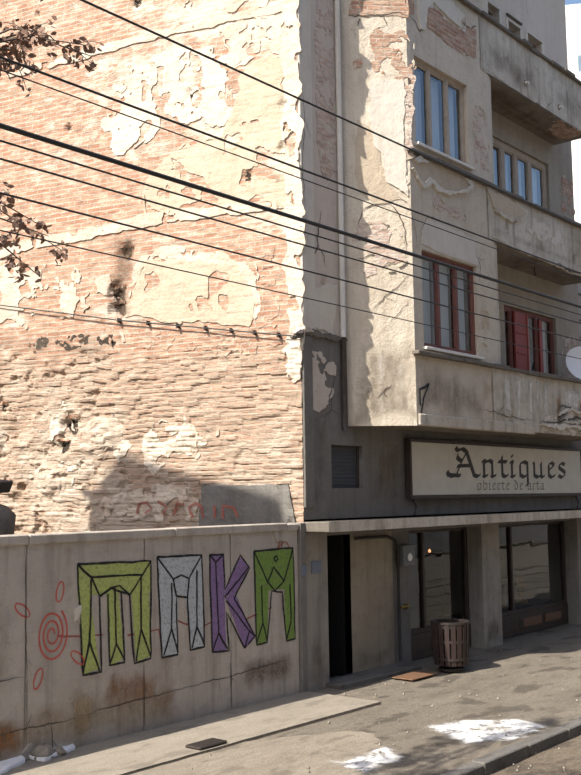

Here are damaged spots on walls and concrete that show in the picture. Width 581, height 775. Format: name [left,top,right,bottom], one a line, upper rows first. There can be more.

flaking render [348,0,477,58]
flaking render [353,27,474,205]
flaking render [0,0,338,412]
flaking render [421,220,479,267]
crack [373,276,410,317]
flaking render [47,401,81,486]
flaking render [99,416,220,522]
flaking render [540,404,581,436]
crack [0,551,31,690]
crack [0,659,290,747]